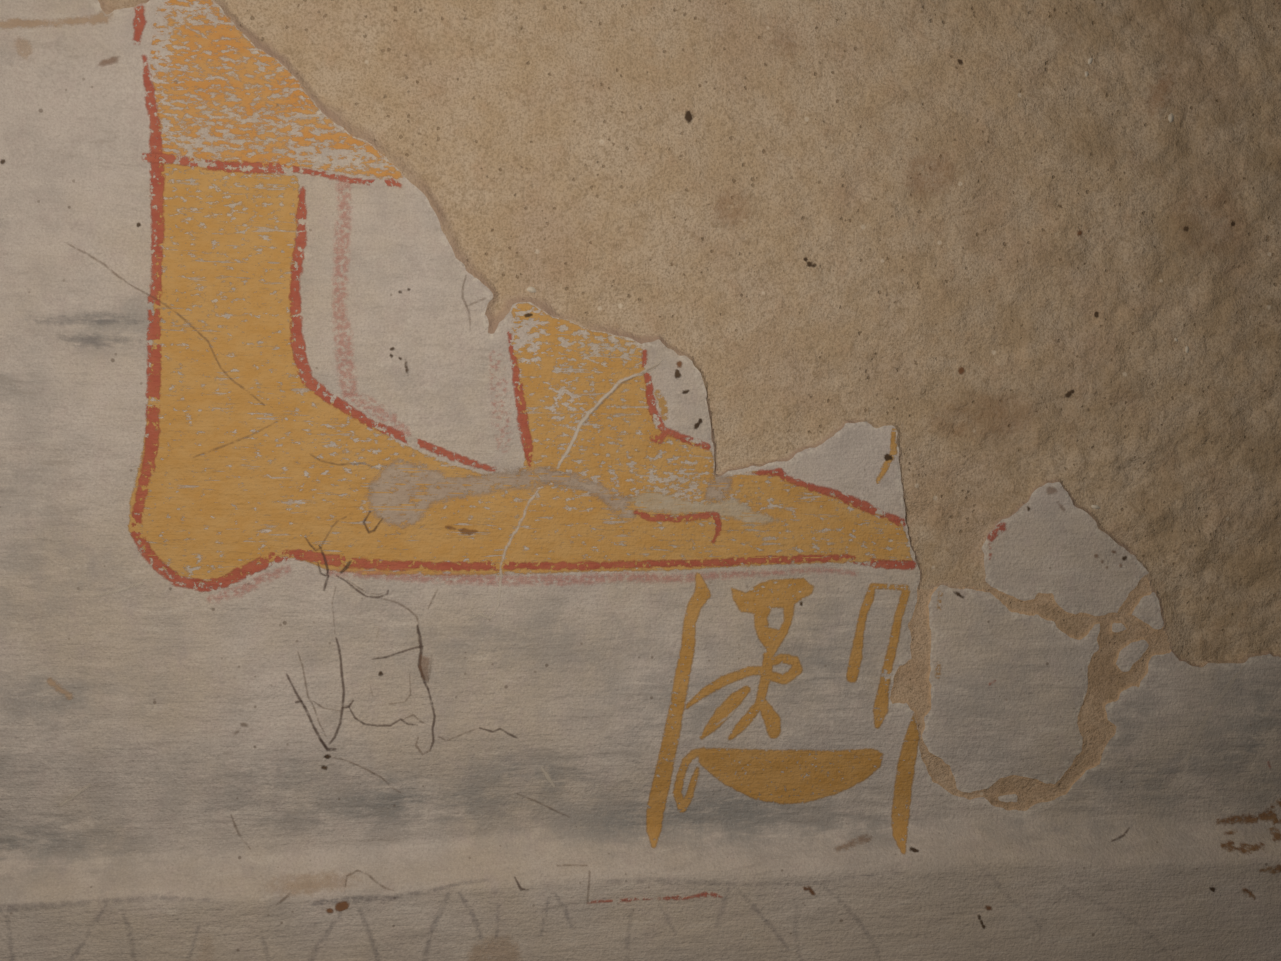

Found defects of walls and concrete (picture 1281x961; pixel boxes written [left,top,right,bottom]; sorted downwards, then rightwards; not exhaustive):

flaking render [98,0,150,14]
flaking render [213,0,1281,668]
crack [363,359,663,619]
crack [322,552,380,598]
crack [293,625,435,750]